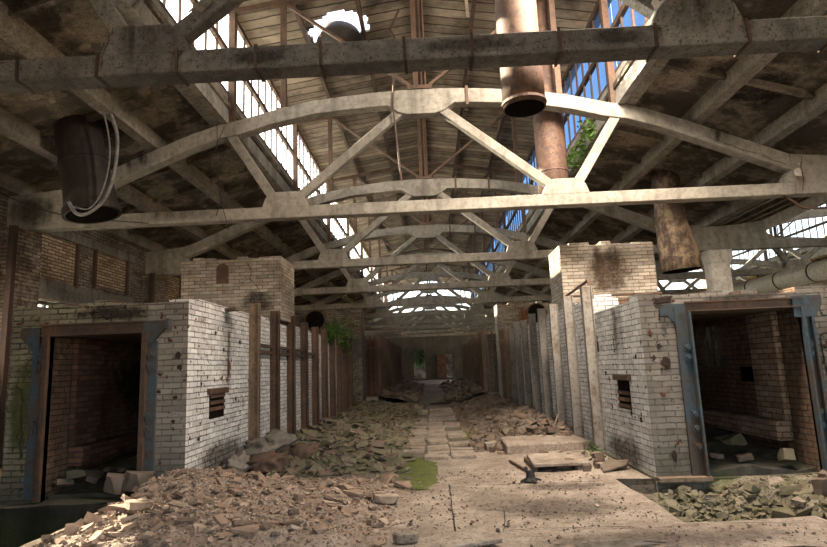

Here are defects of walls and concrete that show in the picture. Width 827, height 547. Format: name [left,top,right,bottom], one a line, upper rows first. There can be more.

spalling [650,343,671,371]
crack [819,297,827,383]